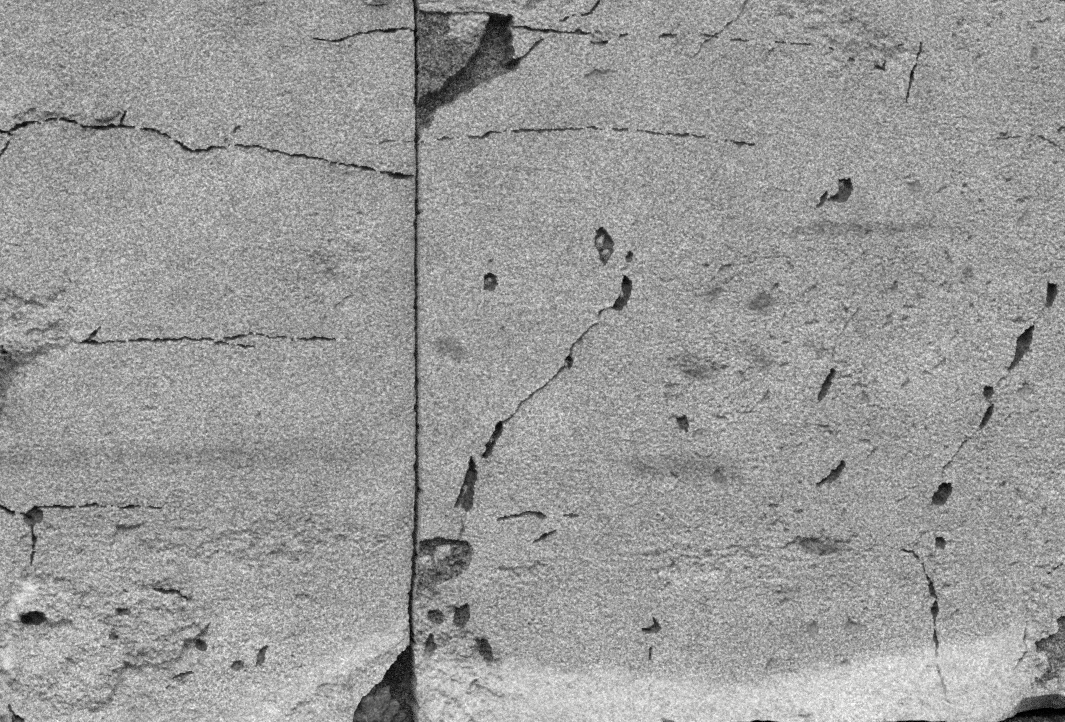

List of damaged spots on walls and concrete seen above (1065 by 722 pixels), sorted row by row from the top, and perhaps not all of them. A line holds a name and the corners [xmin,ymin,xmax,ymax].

crack [0,110,755,179]
spalling [416,0,590,131]
crack [505,0,628,69]
spalling [583,68,617,81]
spalling [0,284,100,469]
crack [80,295,353,349]
crack [454,275,632,543]
crack [931,282,1058,505]
crack [0,502,162,566]
spalling [0,510,396,722]
spalling [244,536,548,722]
spalling [1012,551,1065,709]